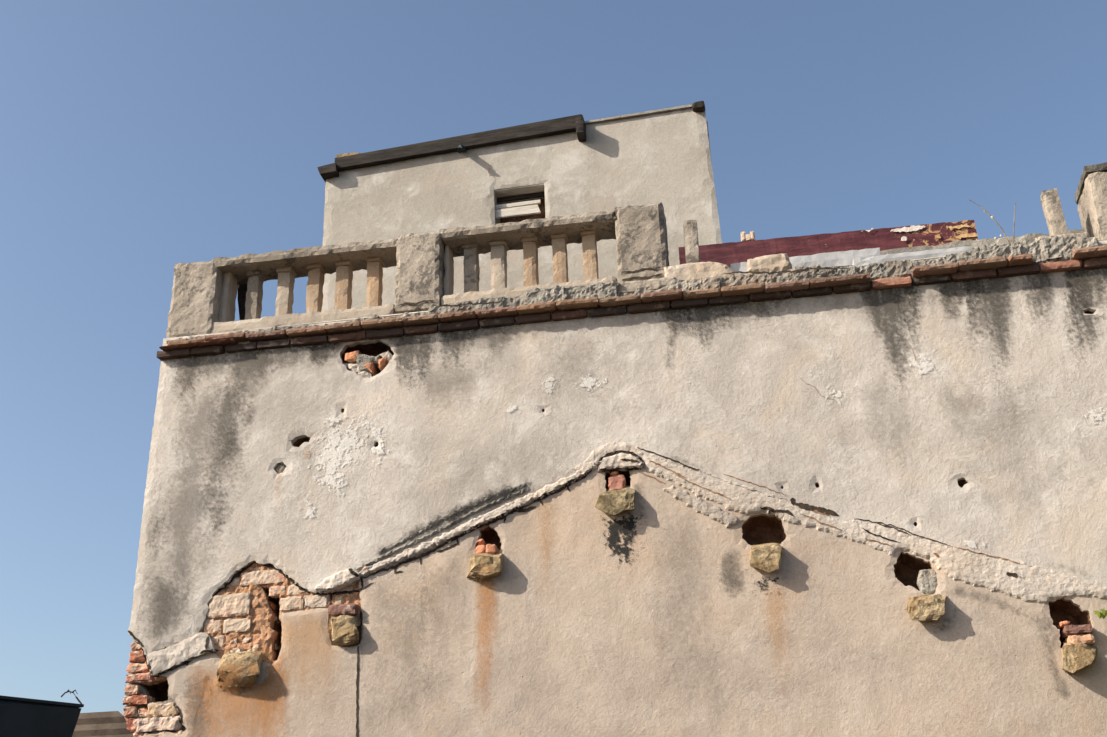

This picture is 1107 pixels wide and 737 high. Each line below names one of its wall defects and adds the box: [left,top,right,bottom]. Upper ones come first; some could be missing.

hole [342,344,394,378]
damp [863,283,918,376]
damp [940,276,1010,353]
damp [1025,273,1052,315]
damp [1065,268,1107,343]
peeling [294,409,392,496]
damp [152,584,184,634]
crack [213,447,1019,737]
spalling [123,561,363,737]
rust [202,654,283,729]